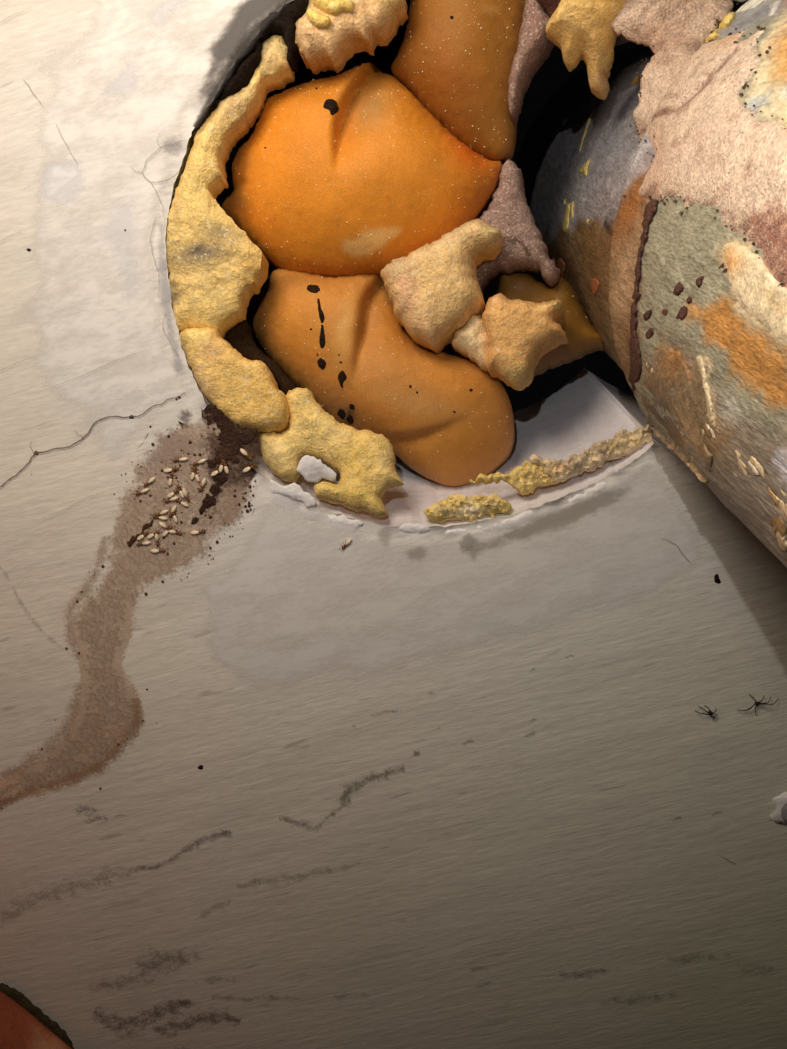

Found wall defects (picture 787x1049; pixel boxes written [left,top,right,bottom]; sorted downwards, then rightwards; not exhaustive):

crack [0,393,184,487]
corrosion [640,347,719,483]
corrosion [733,450,787,552]